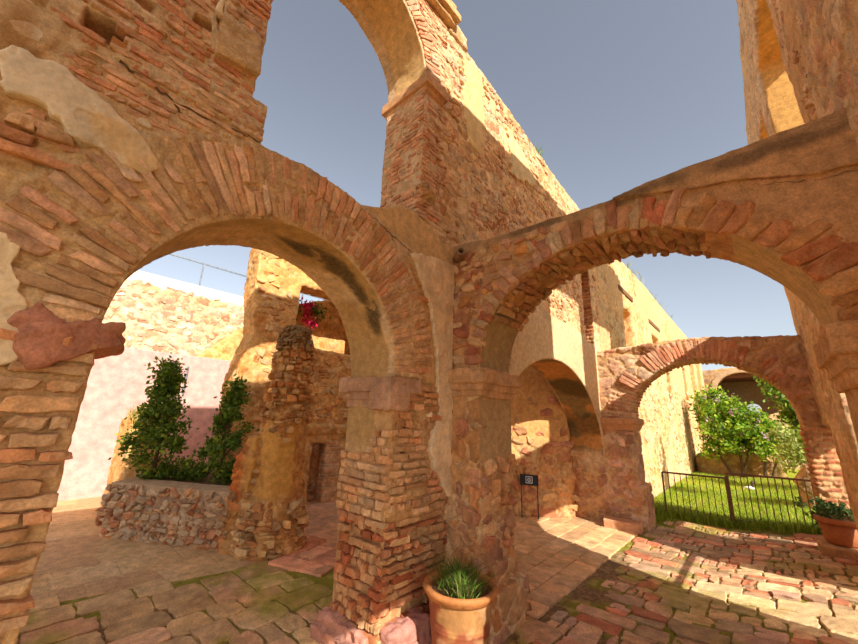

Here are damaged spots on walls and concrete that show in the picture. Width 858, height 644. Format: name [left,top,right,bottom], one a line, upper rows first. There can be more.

flaking render [0,232,28,366]